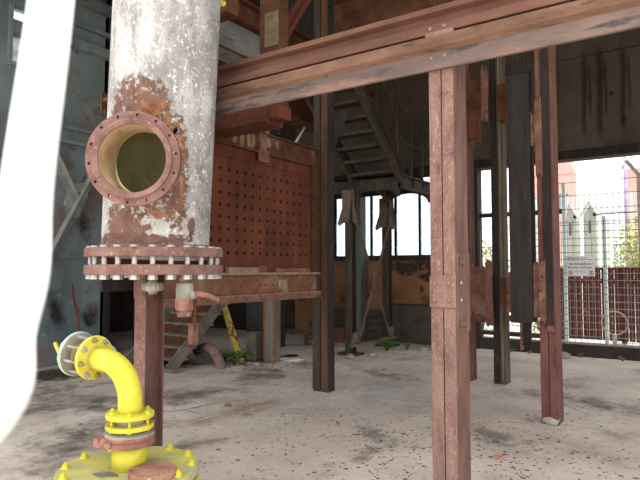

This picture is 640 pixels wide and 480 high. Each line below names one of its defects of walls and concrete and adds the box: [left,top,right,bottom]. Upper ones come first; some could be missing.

corrosion [101,75,195,245]